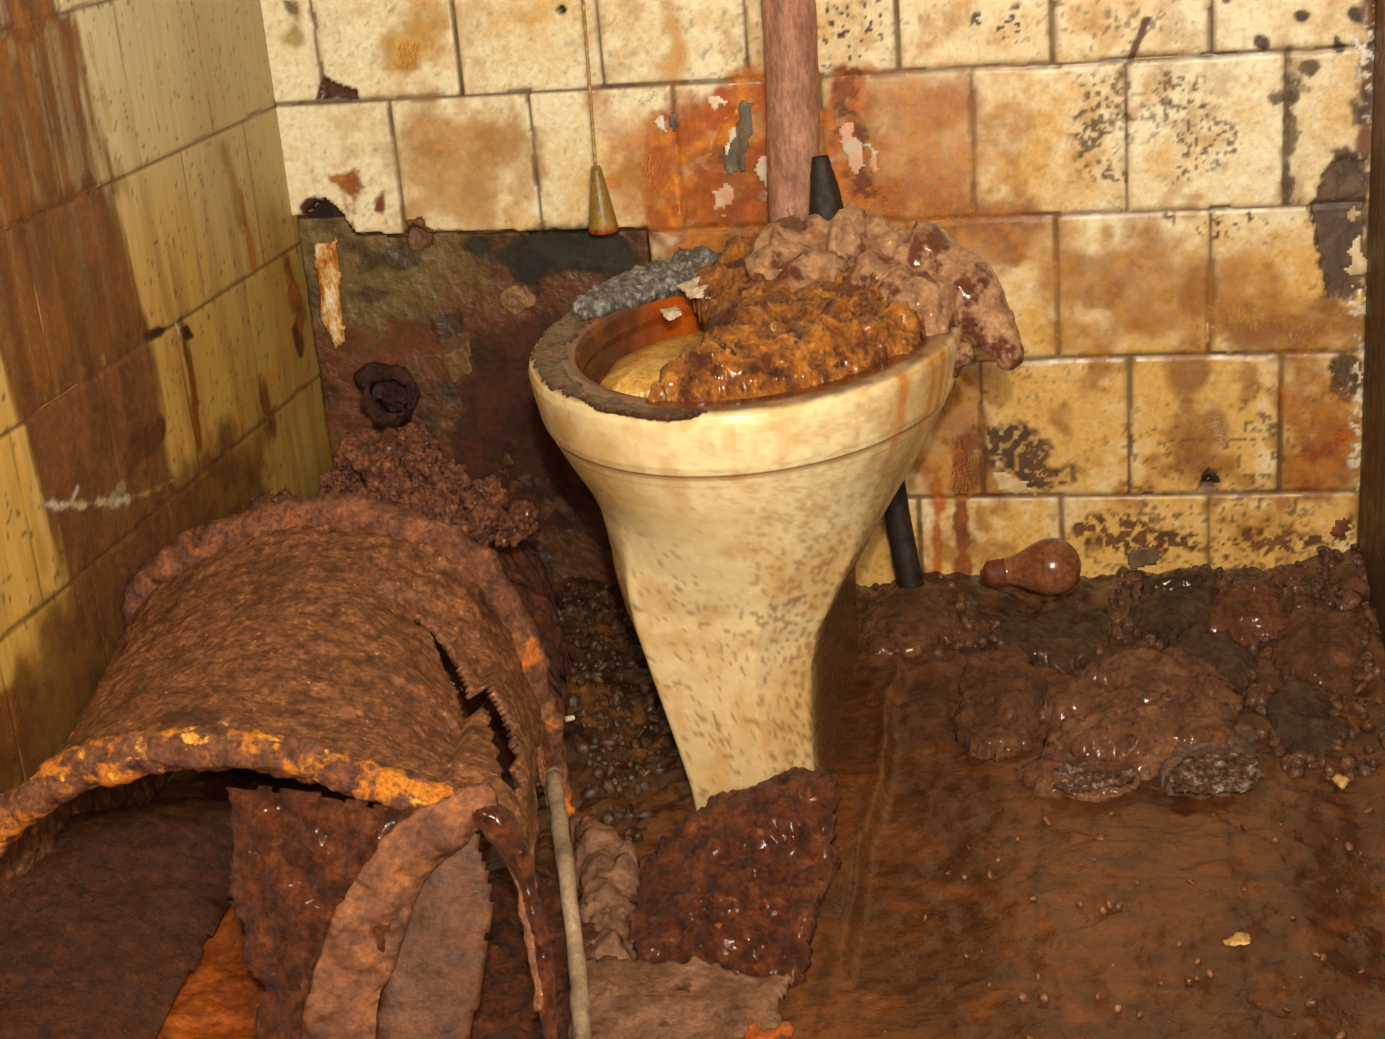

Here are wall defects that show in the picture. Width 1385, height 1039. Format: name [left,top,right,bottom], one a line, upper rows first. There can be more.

peeling [639,91,679,132]
corrosion [625,68,769,260]
peeling [708,96,768,217]
corrosion [820,66,1042,263]
spalling [1310,0,1376,317]
corrosion [0,0,179,646]
corrosion [178,319,202,451]
corrosion [285,257,304,356]
spalling [297,197,650,587]
leakage [951,424,1075,496]
leakage [1046,0,1385,652]
peeling [1330,334,1364,491]